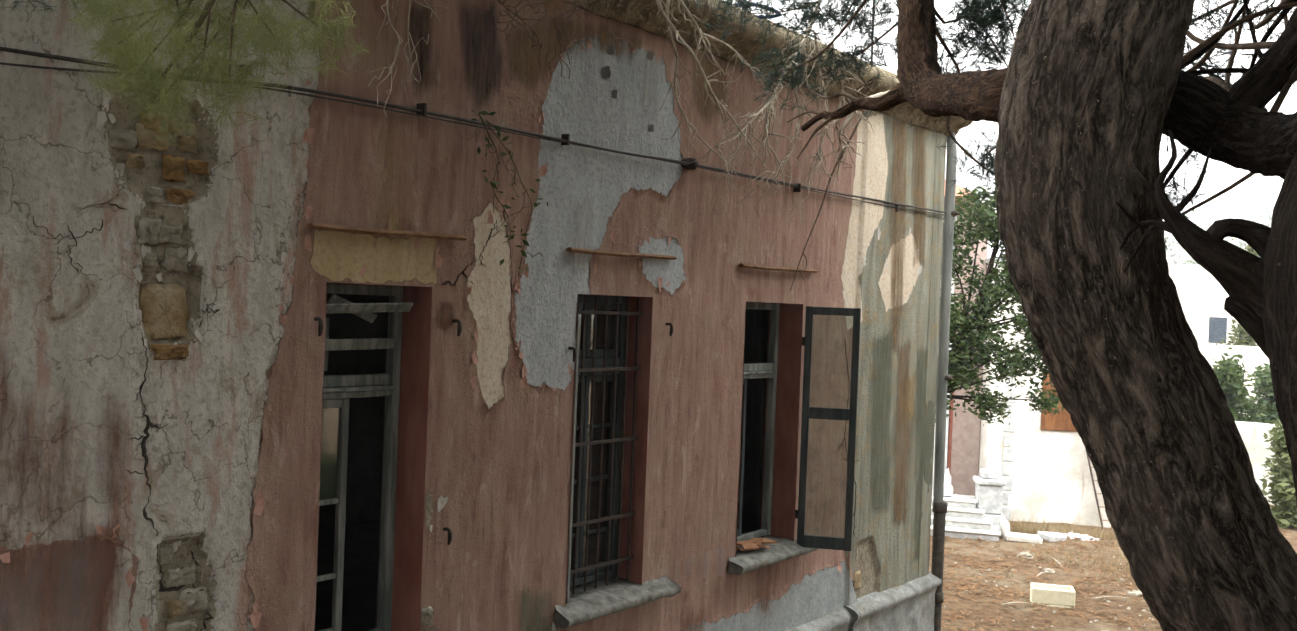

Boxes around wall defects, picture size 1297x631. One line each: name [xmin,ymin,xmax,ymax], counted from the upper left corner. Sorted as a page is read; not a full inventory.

crack [124,338,213,631]
peeling [0,0,443,631]
peeling [459,28,689,424]
peeling [669,535,882,631]